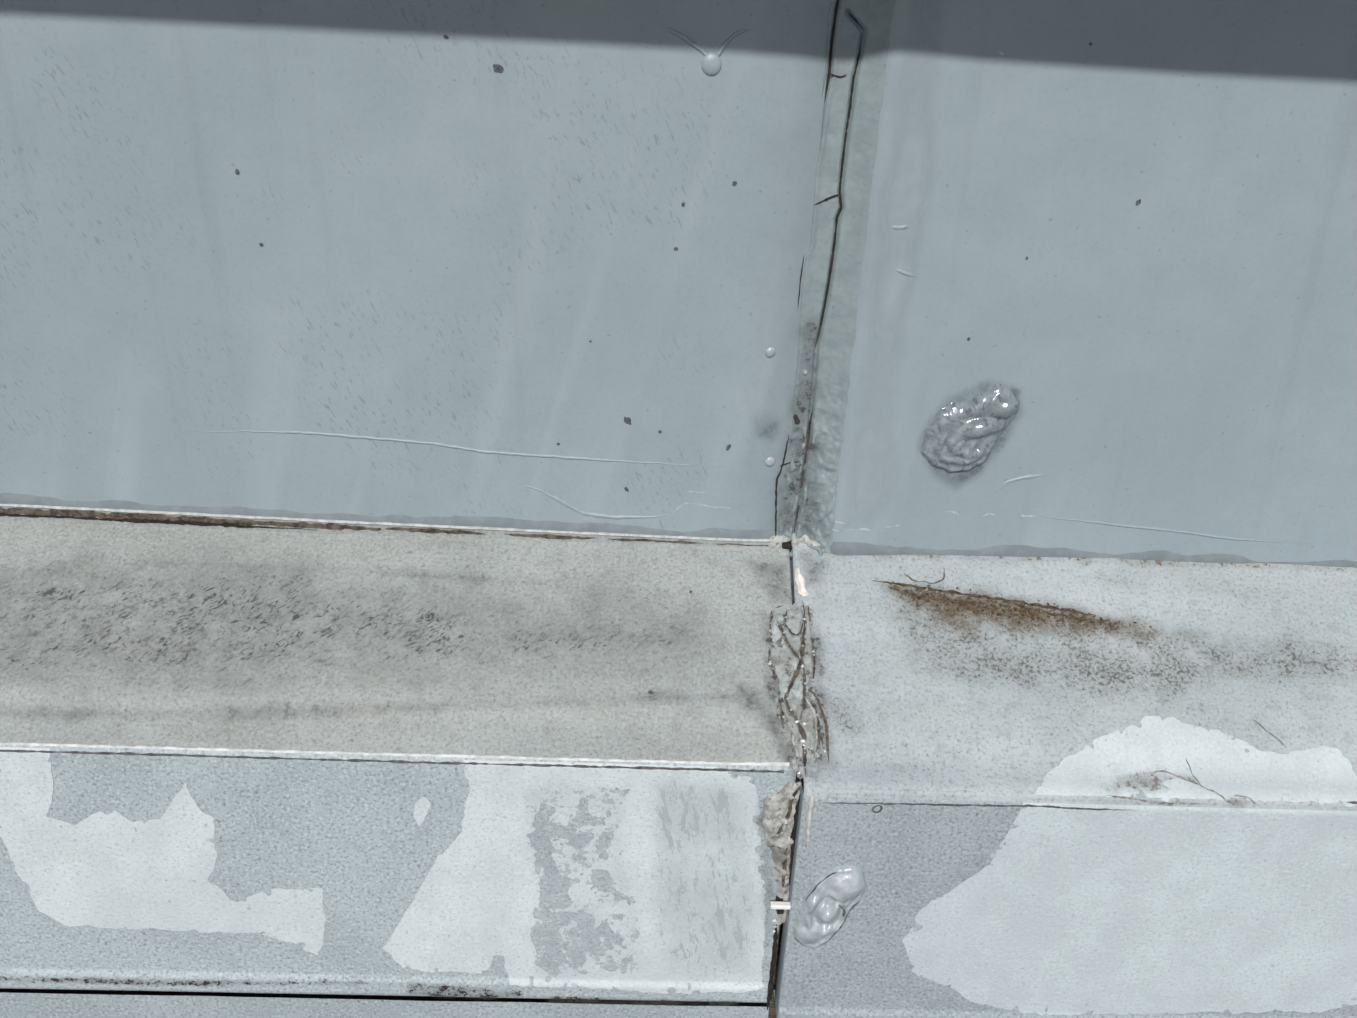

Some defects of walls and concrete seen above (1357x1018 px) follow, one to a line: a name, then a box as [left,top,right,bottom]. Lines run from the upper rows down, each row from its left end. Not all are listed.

crack [798,0,886,347]
crack [775,407,813,560]
rust [874,569,1152,634]
peeling [0,747,327,955]
peeling [383,760,777,994]
crack [768,603,1138,888]
peeling [902,716,1357,1018]